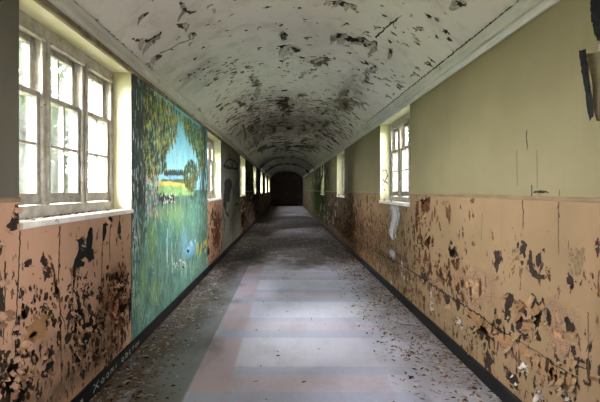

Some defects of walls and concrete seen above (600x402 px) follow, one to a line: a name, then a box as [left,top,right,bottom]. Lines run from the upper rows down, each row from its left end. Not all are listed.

peeling [132,32,162,56]
peeling [176,1,197,46]
peeling [179,5,435,159]
peeling [323,0,359,13]
peeling [579,0,600,121]
peeling [6,203,26,235]
peeling [102,217,122,246]
peeling [207,204,222,259]
leakage [389,205,400,240]
peeling [0,227,135,402]
peeling [318,187,600,402]